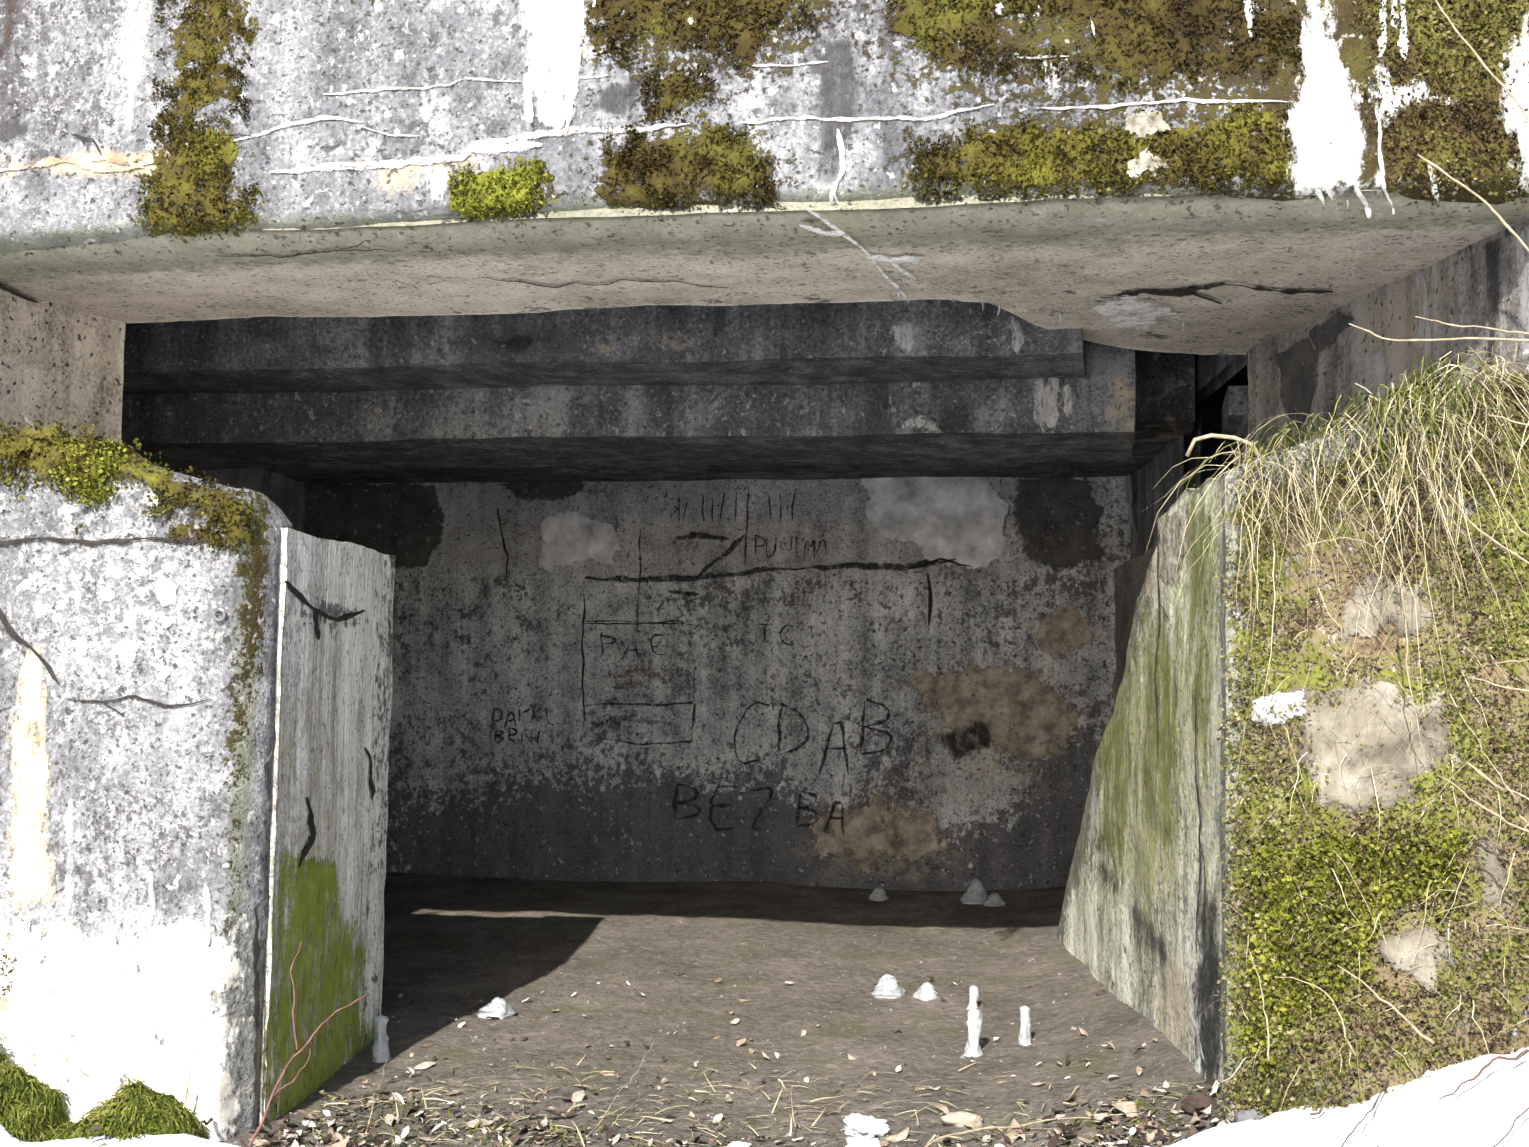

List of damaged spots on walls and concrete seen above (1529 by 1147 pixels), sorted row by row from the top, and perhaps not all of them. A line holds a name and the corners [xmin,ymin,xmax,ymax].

crack [71,134,102,156]
crack [190,134,251,144]
leakage [521,0,596,131]
leakage [1287,0,1450,218]
leakage [1503,15,1529,193]
crack [0,530,229,547]
crack [0,609,212,717]
crack [1194,697,1206,951]
leakage [0,645,248,1141]
leakage [1133,905,1166,963]
leakage [1192,891,1222,1081]